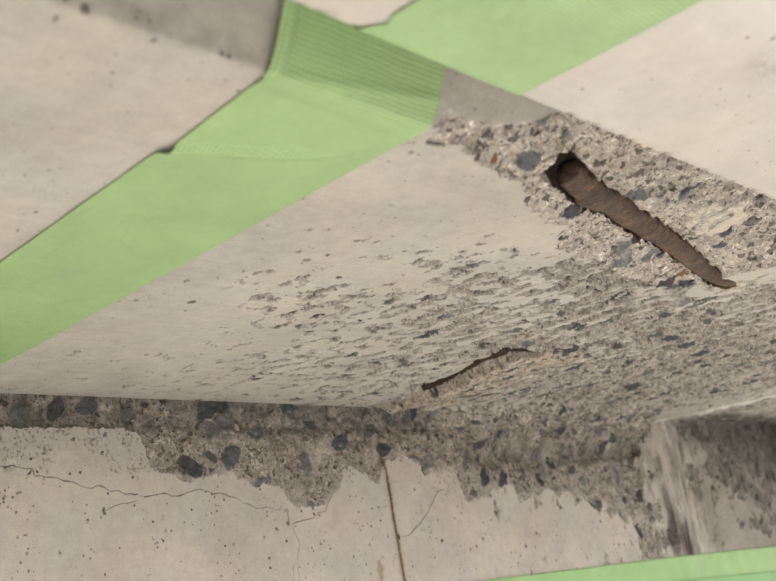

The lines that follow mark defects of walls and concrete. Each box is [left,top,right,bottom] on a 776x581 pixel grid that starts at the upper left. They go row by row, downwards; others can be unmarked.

corrosion [557,159,737,287]
spalling [0,109,776,561]
crack [0,459,340,581]